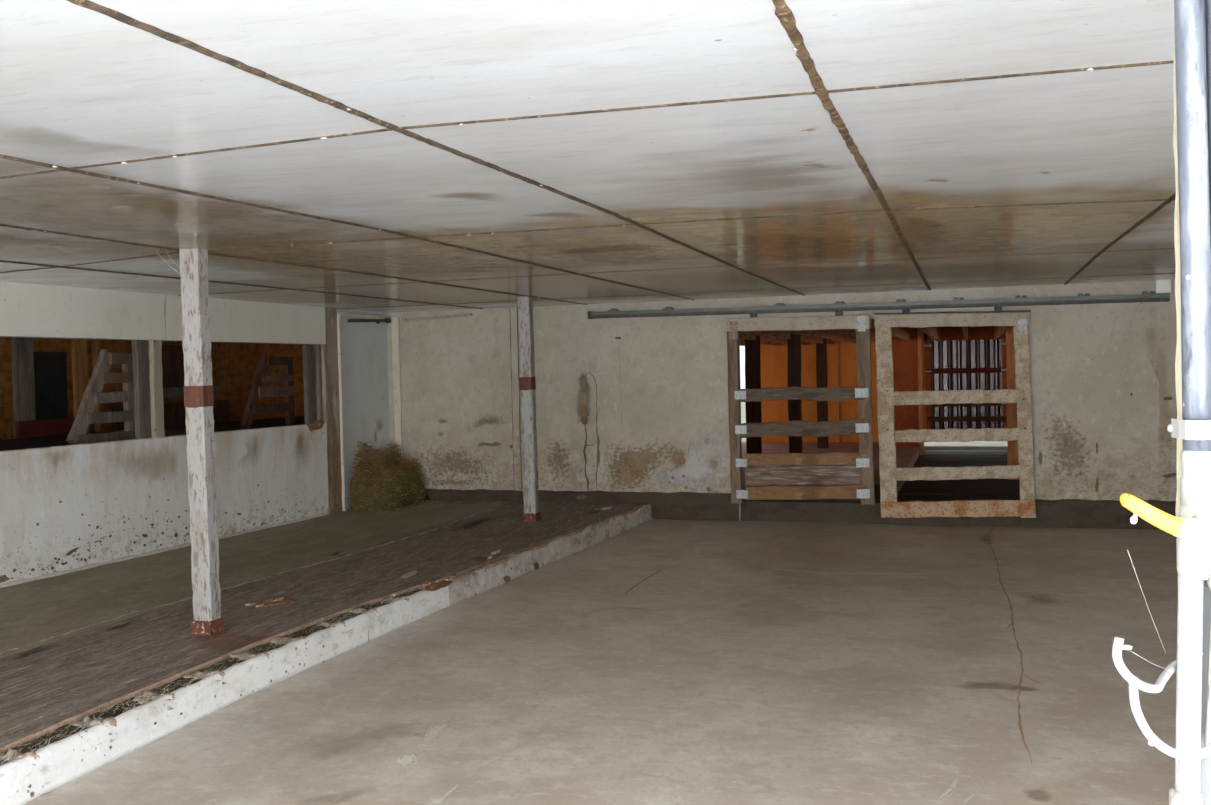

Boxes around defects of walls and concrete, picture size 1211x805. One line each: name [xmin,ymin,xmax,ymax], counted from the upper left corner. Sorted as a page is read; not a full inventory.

crack [987,527,1041,764]